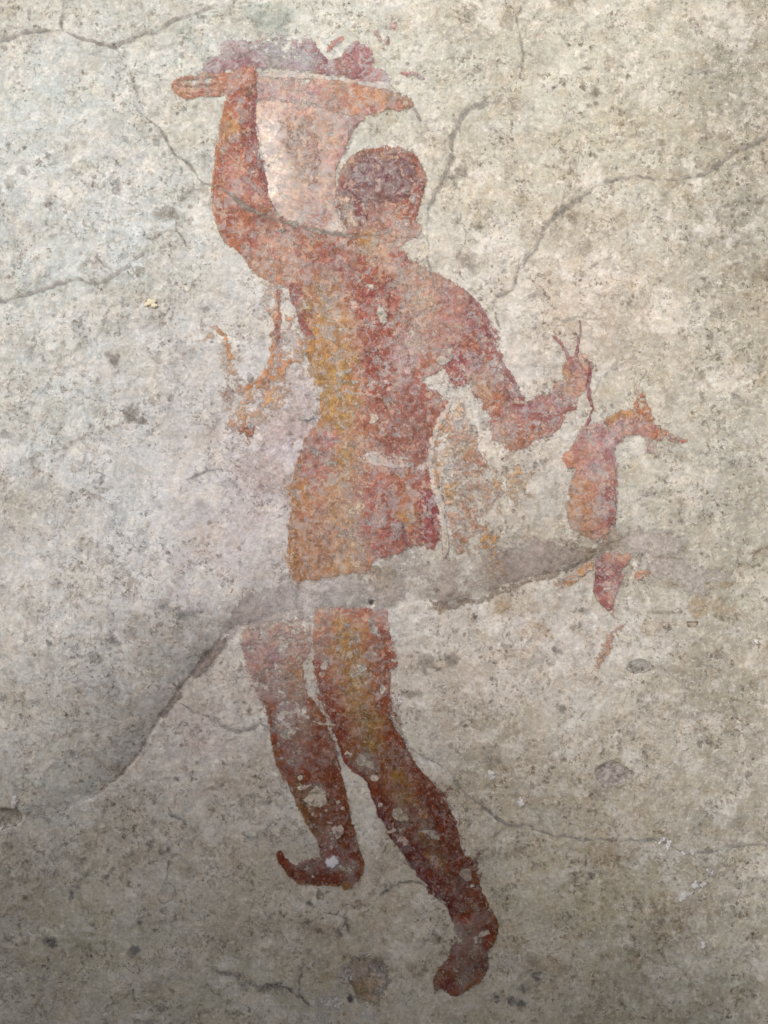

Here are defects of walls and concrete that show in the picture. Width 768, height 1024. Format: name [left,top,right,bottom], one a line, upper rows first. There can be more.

crack [0,6,214,49]
crack [0,211,185,303]
crack [147,118,432,276]
crack [427,99,500,209]
crack [492,131,768,326]
crack [180,703,286,735]